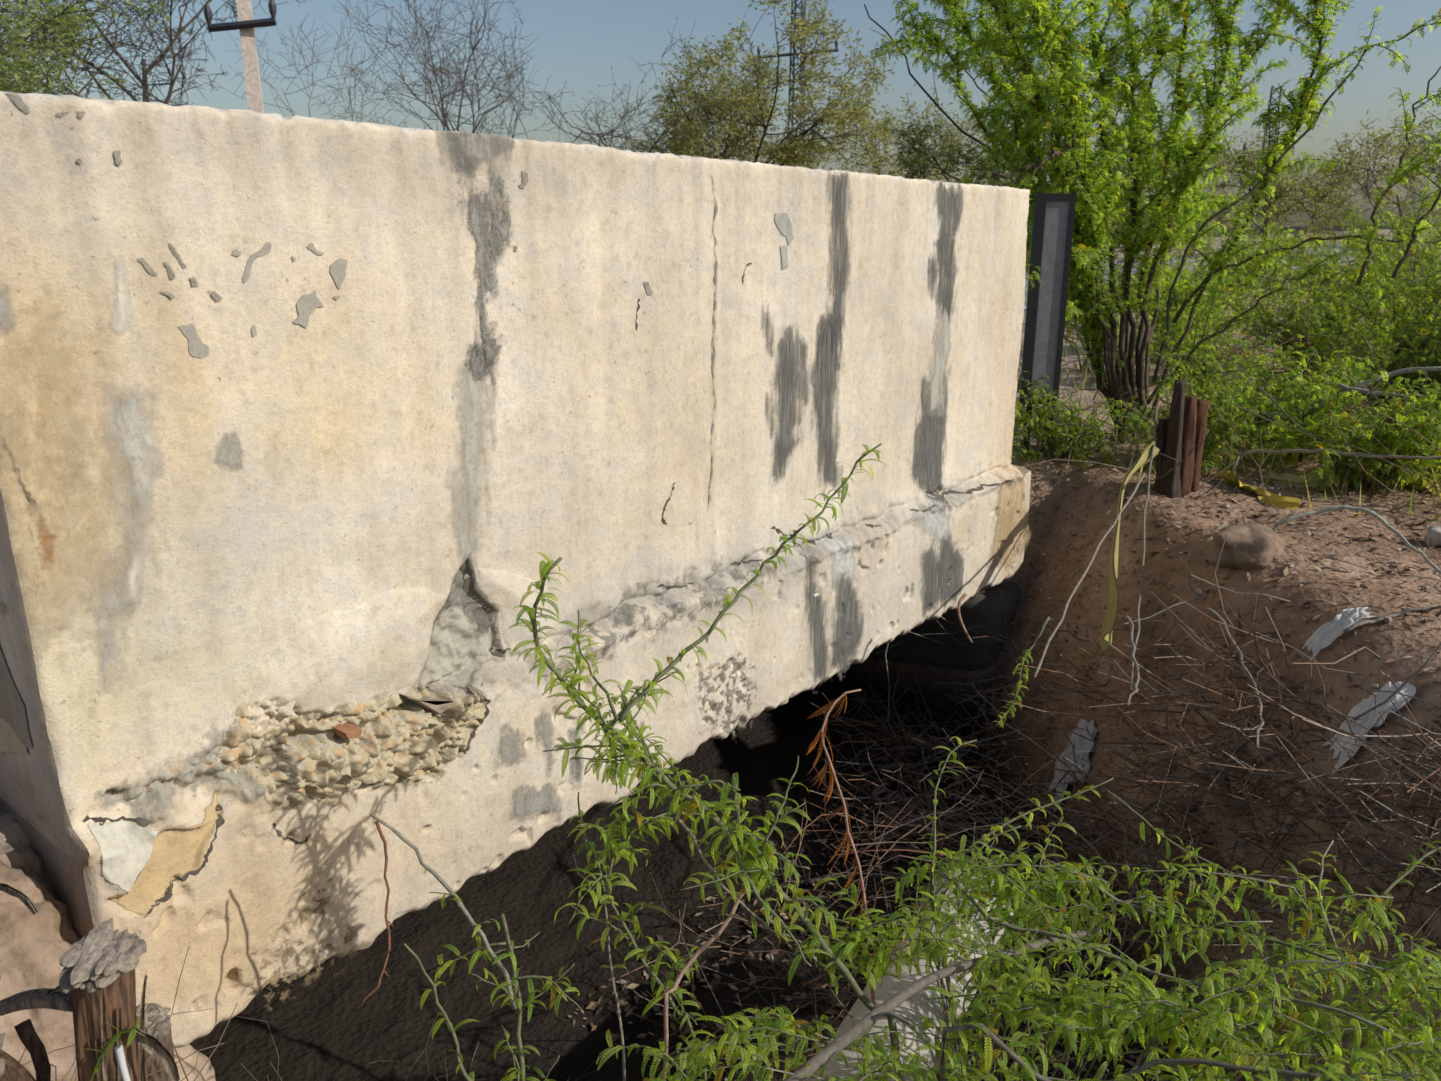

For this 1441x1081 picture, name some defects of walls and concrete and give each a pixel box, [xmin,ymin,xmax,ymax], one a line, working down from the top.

peeling [0,649,32,755]
spalling [88,555,505,915]
damp [442,131,512,567]
crack [662,482,675,525]
crack [708,177,752,512]
damp [763,173,852,486]
damp [806,533,864,680]
damp [913,182,964,616]